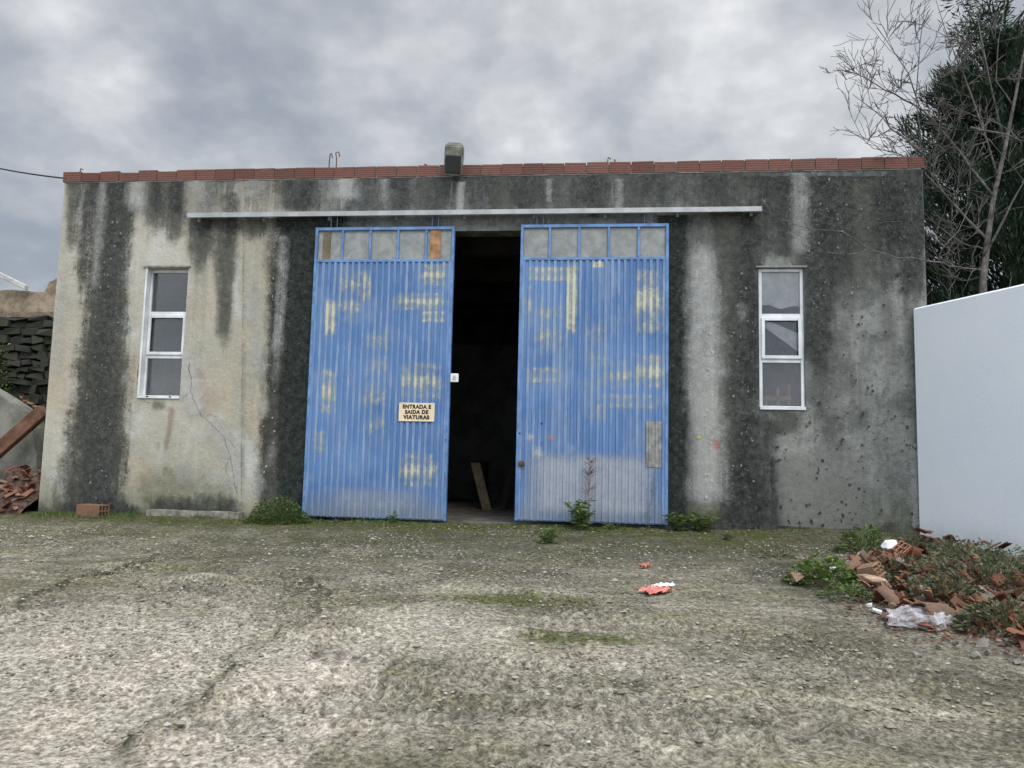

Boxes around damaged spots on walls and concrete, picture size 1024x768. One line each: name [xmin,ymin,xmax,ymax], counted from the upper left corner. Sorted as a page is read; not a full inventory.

peeling [325,272,371,334]
peeling [400,264,445,322]
peeling [529,266,577,339]
peeling [636,271,663,332]
damp [61,178,356,519]
damp [457,170,925,530]
peeling [322,371,335,409]
peeling [402,366,440,397]
peeling [610,355,660,408]
crack [183,364,237,491]
peeling [400,454,437,486]